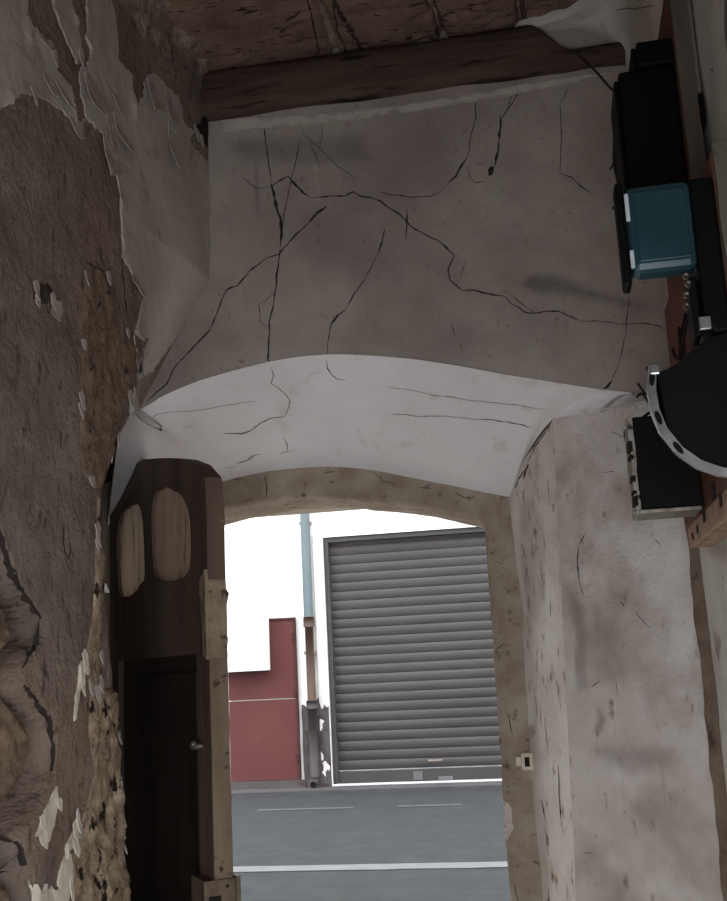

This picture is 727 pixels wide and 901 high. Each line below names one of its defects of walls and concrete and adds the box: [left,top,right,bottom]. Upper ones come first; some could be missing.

peeling [0,0,212,901]
crack [150,80,665,468]
crack [390,387,550,520]